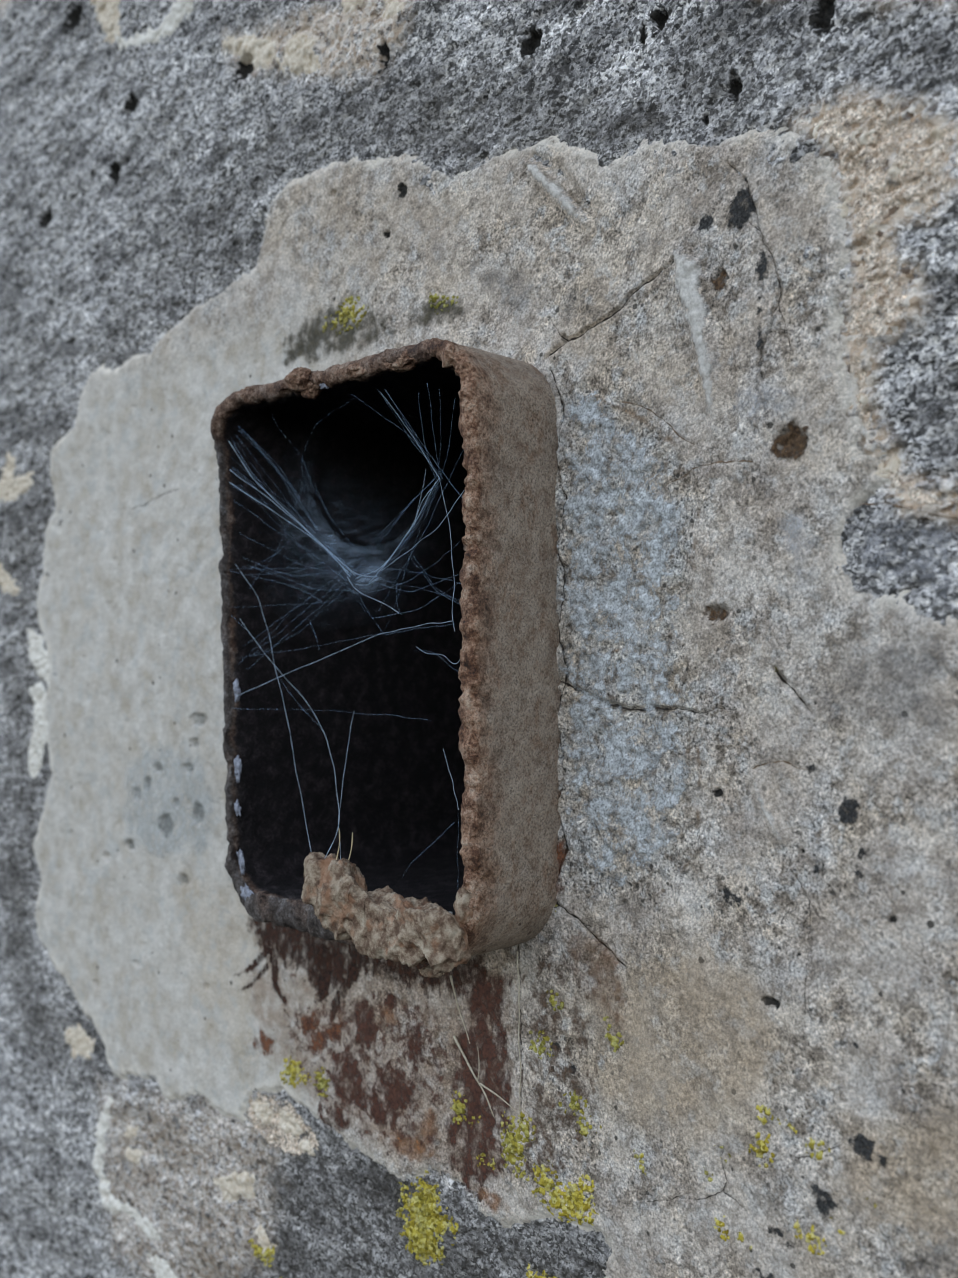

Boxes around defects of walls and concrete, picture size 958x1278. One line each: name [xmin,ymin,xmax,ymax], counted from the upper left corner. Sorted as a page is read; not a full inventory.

crack [728,163,790,378]
crack [549,261,733,720]
crack [556,823,626,967]
rust [243,918,620,1210]